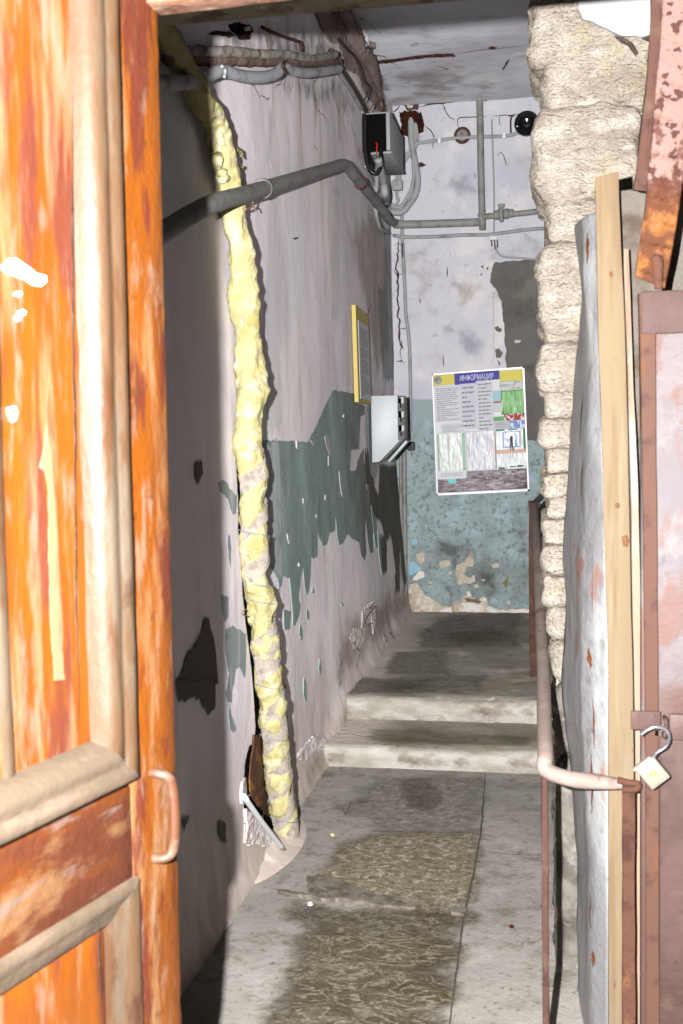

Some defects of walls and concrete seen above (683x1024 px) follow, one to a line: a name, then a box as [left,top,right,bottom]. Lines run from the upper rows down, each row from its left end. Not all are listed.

peeling [317,10,425,137]
crack [367,238,406,363]
peeling [262,390,383,641]
flaking render [349,601,377,650]
flaking render [408,539,529,613]
flaking render [296,735,328,760]